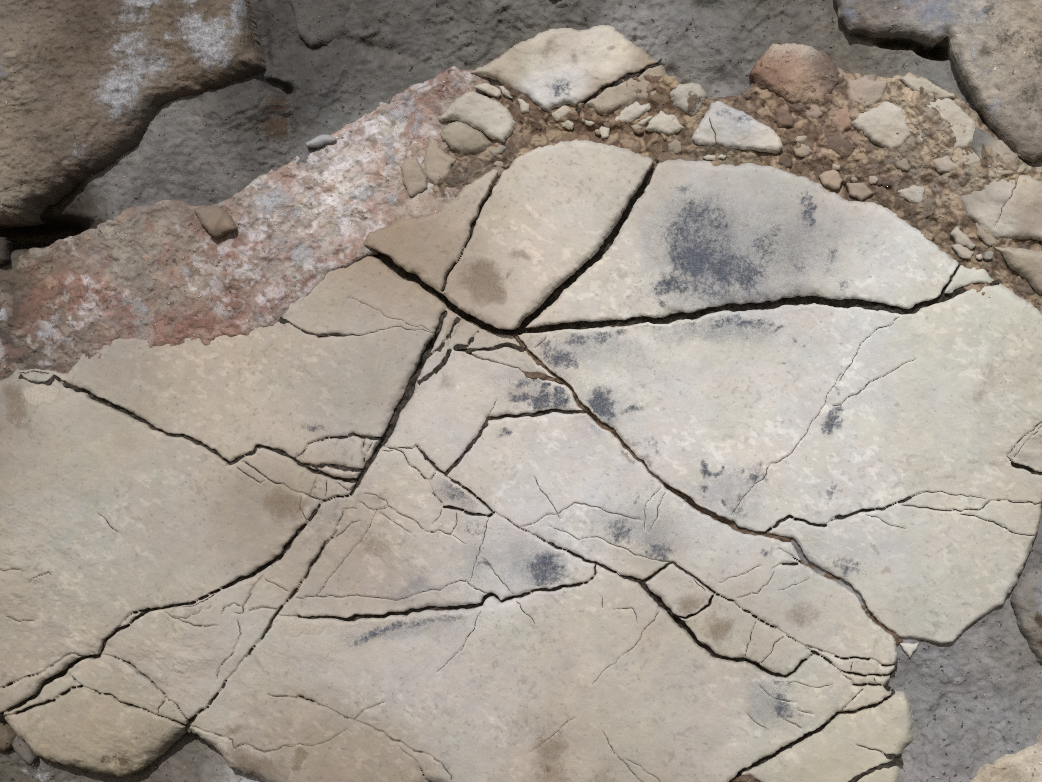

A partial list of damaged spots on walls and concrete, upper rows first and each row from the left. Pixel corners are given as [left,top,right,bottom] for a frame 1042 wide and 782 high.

crack [364,139,653,330]
crack [518,159,960,335]
crack [0,253,1042,782]